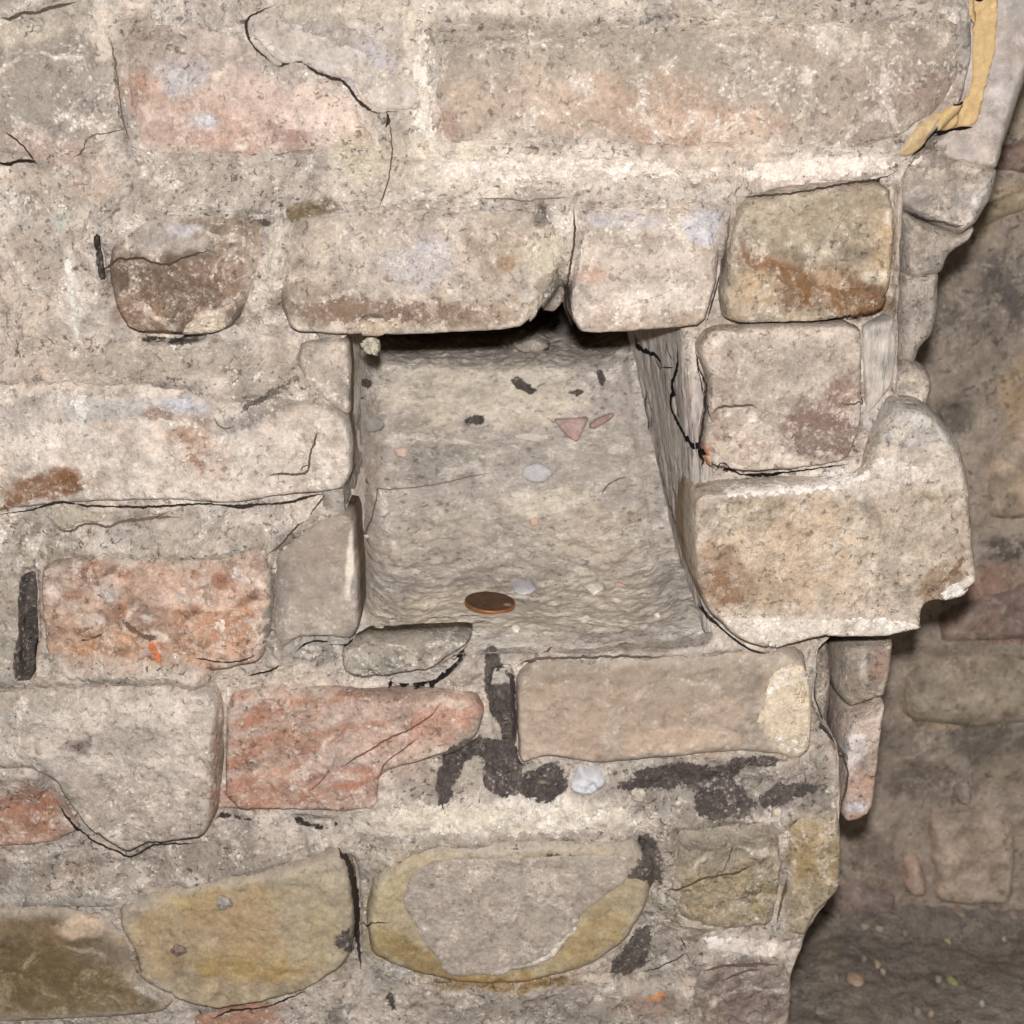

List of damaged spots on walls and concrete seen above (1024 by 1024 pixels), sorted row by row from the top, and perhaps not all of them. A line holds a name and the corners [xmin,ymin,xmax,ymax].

crack [0,132,36,166]
crack [244,5,398,206]
crack [0,427,327,556]
crack [635,339,846,524]
crack [309,615,495,791]
water stain [379,645,665,888]
water stain [616,663,848,822]
crack [338,848,389,969]